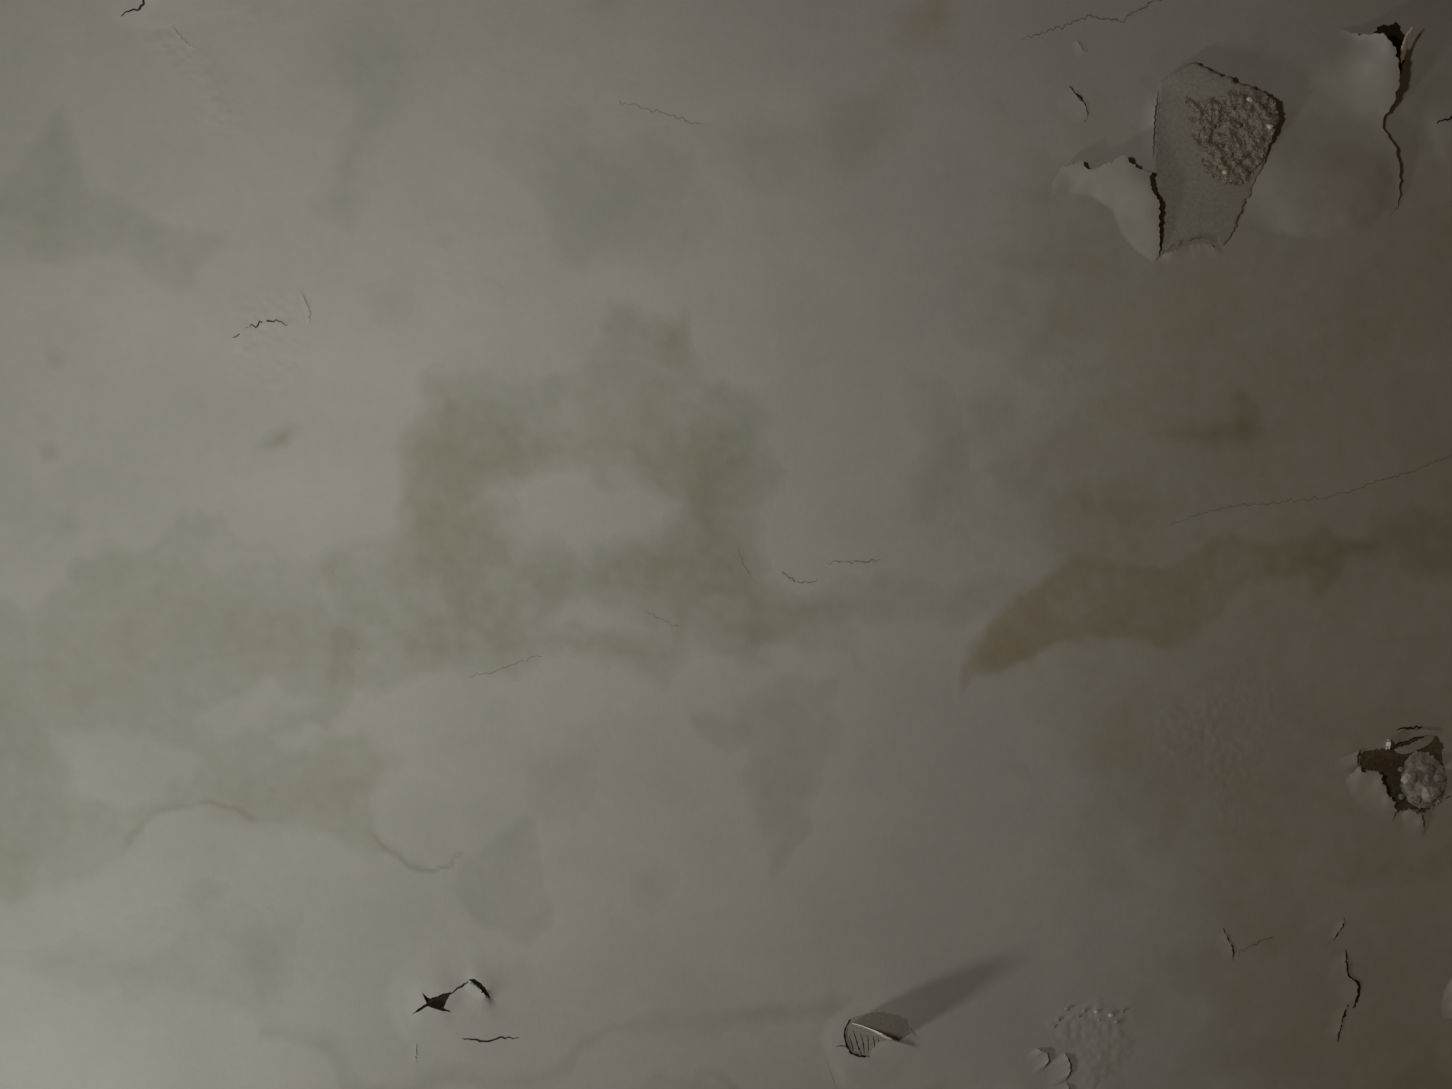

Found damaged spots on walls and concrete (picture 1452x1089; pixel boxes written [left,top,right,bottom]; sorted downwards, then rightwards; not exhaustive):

peeling [1049,22,1413,265]
damp [0,296,1031,952]
damp [895,39,1452,1089]
spalling [1334,725,1452,838]
damp [0,877,852,1089]
crack [1216,928,1273,961]
crack [1325,919,1361,1042]